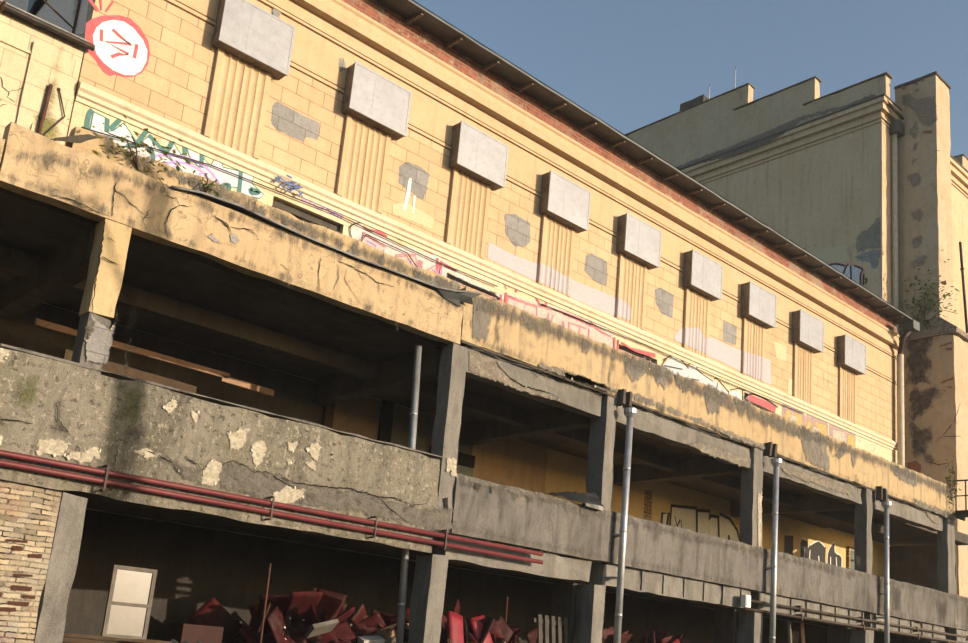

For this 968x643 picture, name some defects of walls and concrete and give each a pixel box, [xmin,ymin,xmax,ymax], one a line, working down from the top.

flaking render [900,80,937,186]
damp [35,154,70,166]
flaking render [853,218,881,252]
peeling [162,399,178,413]
damp [482,298,952,497]
peeling [36,438,101,464]
peeling [134,448,159,458]
peeling [227,428,267,469]
peeling [286,442,322,471]
peeling [201,457,222,486]
peeling [271,486,306,504]